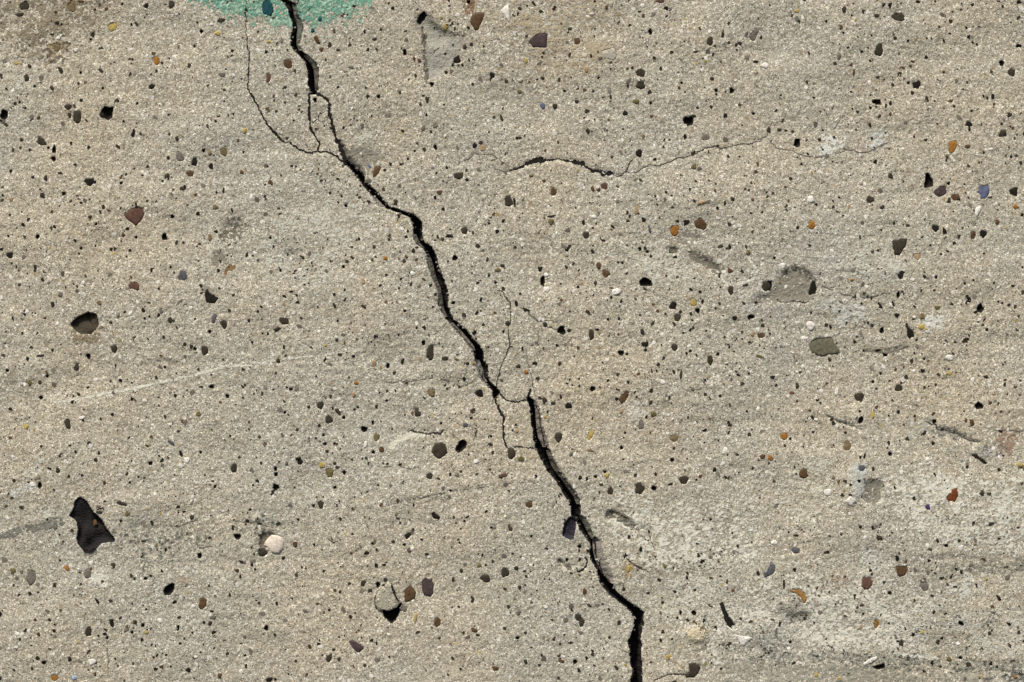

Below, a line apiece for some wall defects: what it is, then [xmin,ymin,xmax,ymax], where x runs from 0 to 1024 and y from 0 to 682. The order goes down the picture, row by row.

crack [245,0,685,682]